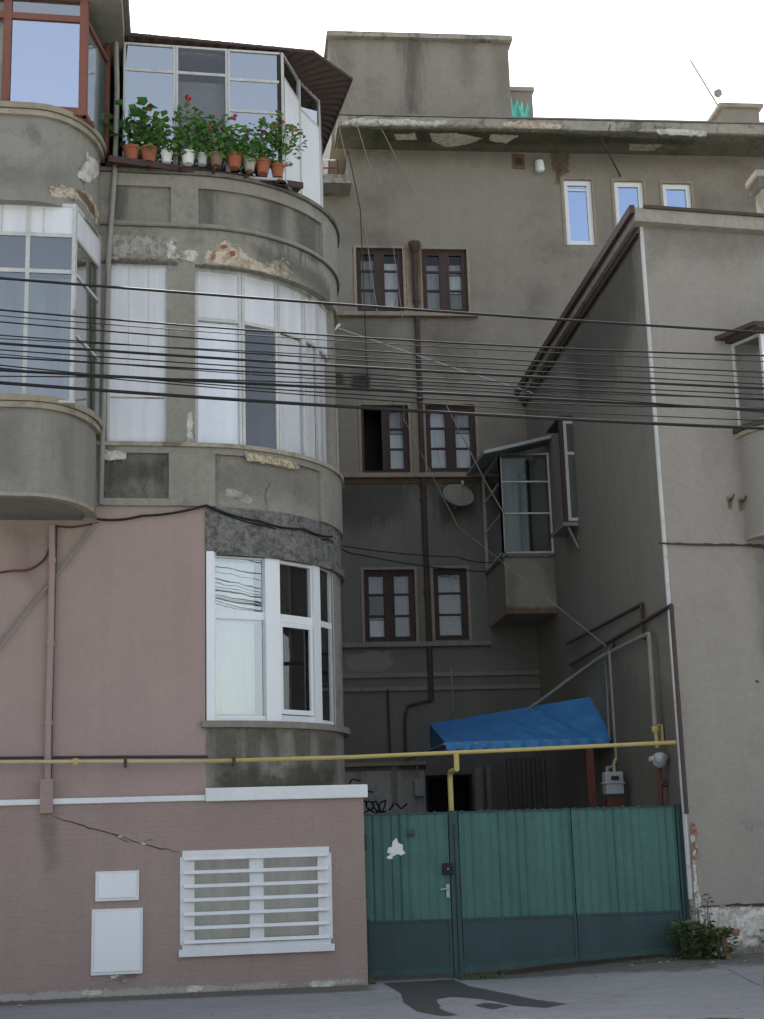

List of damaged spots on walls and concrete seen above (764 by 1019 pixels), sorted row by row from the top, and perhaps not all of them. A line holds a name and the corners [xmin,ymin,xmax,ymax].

spalling [340,117,563,147]
spalling [629,128,707,151]
spalling [49,151,100,228]
spalling [180,240,292,279]
peeling [243,451,300,469]
crack [54,816,176,852]
peeling [690,822,764,956]